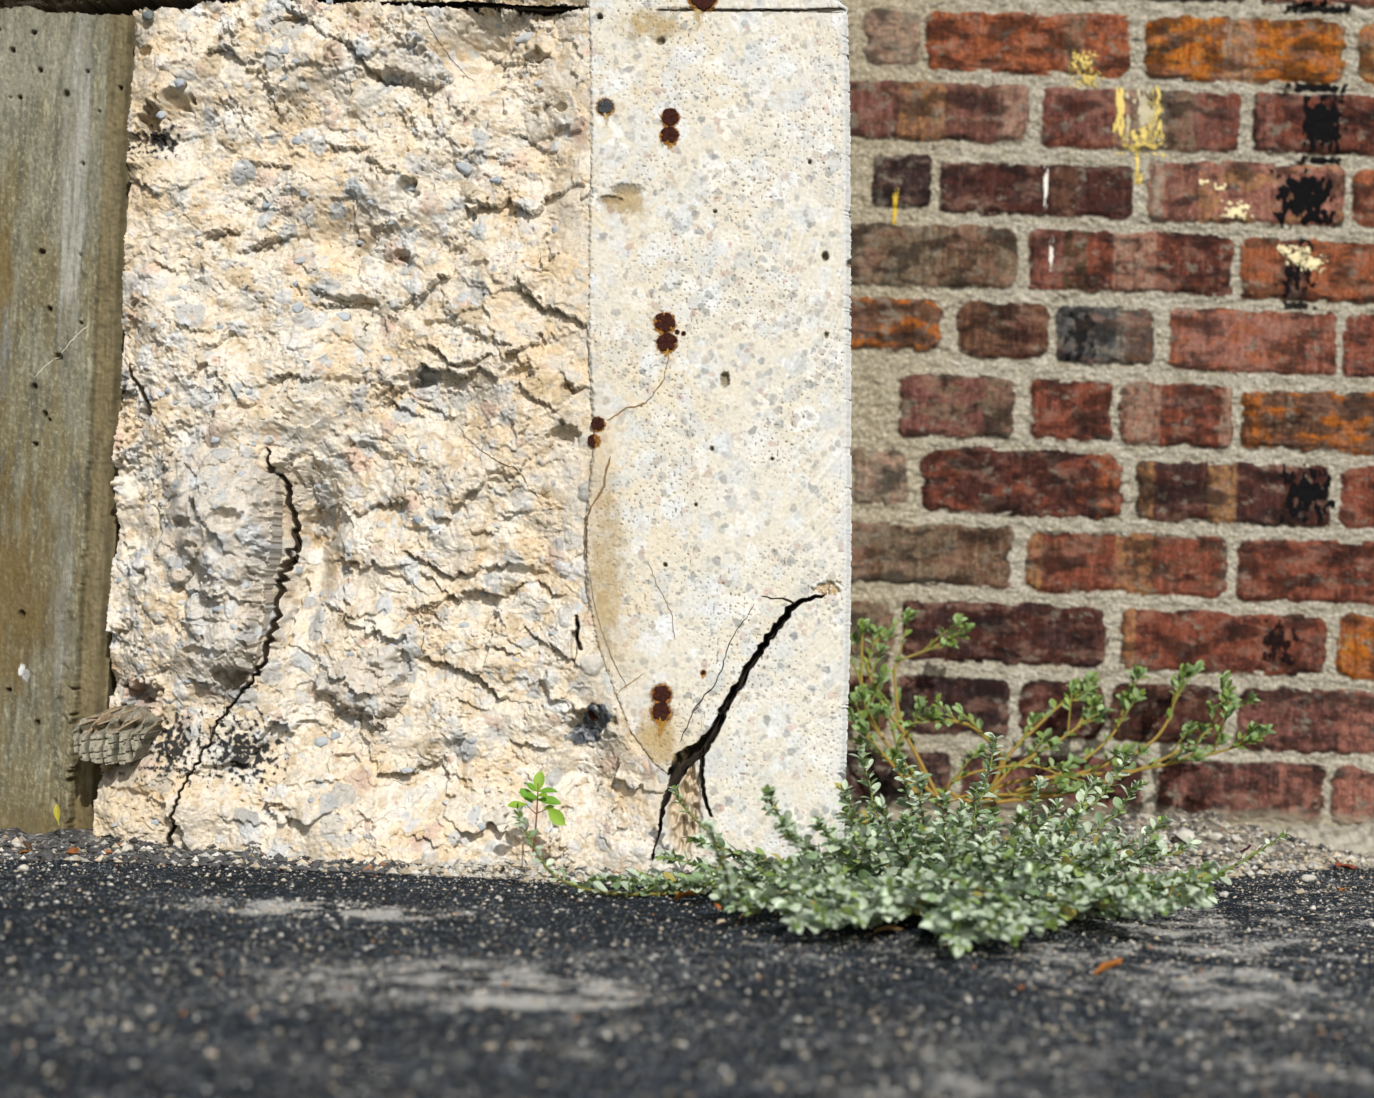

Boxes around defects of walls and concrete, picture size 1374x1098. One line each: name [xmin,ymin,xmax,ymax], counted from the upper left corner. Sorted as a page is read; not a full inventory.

rust [687,0,718,21]
crack [291,0,582,80]
rust [660,108,681,149]
rust [653,312,686,359]
rust [588,416,606,461]
crack [166,448,302,845]
rust [650,683,673,735]
crack [651,594,825,853]